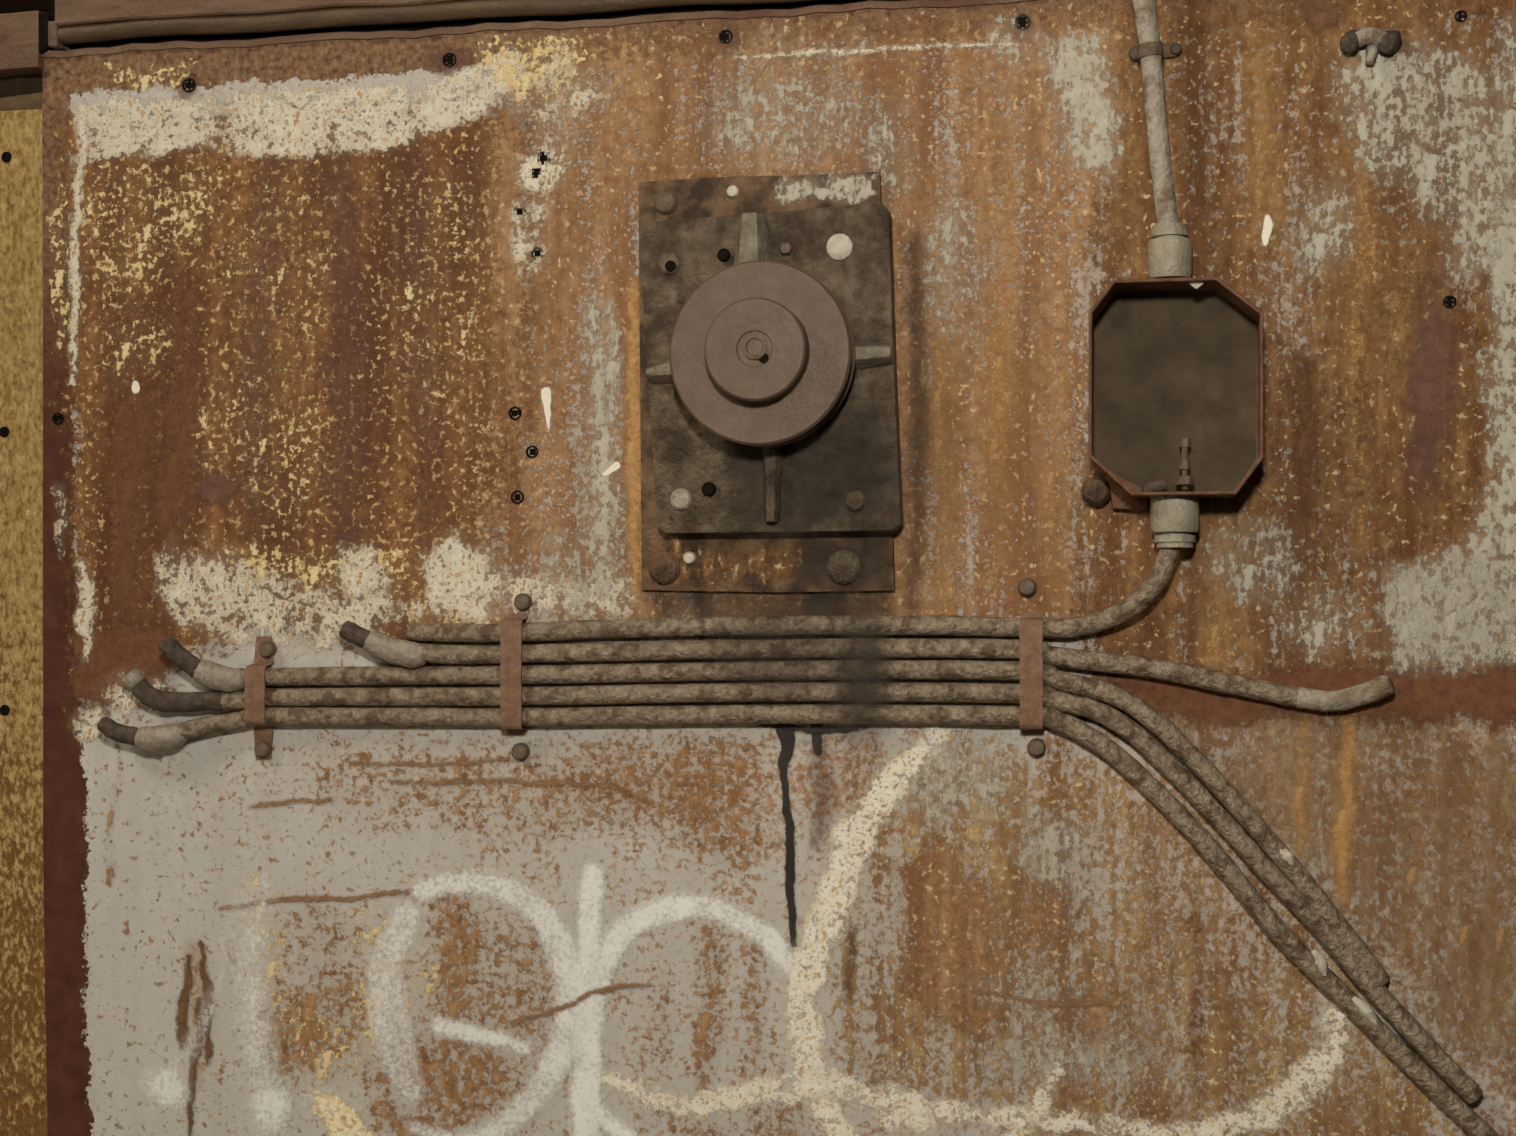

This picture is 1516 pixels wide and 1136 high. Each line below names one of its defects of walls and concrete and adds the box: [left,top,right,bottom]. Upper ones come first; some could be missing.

peeling [46,33,611,386]
corrosion [51,0,1159,730]
peeling [51,487,98,662]
corrosion [1073,0,1516,1089]
corrosion [316,734,774,878]
peeling [897,732,1100,900]
corrosion [175,940,213,1136]
corrosion [246,868,557,1136]
corrosion [650,972,671,1079]
corrosion [671,923,806,1136]
peeling [964,956,1160,1085]